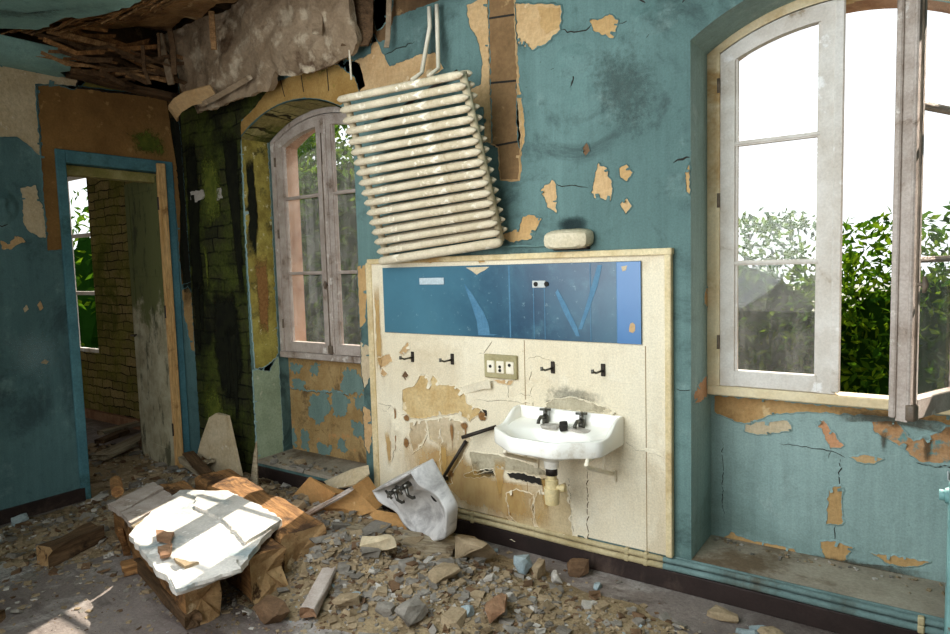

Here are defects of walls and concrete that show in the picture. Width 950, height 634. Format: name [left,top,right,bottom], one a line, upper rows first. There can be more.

spalling [514,1,564,52]
crack [562,22,591,33]
peeling [515,83,527,158]
flaking render [0,0,445,474]
peeling [503,179,559,244]
peeling [590,162,634,215]
peeling [693,373,950,468]
peeling [401,370,574,536]
peeling [824,484,846,526]
peeling [818,539,855,561]
peeling [869,551,932,568]